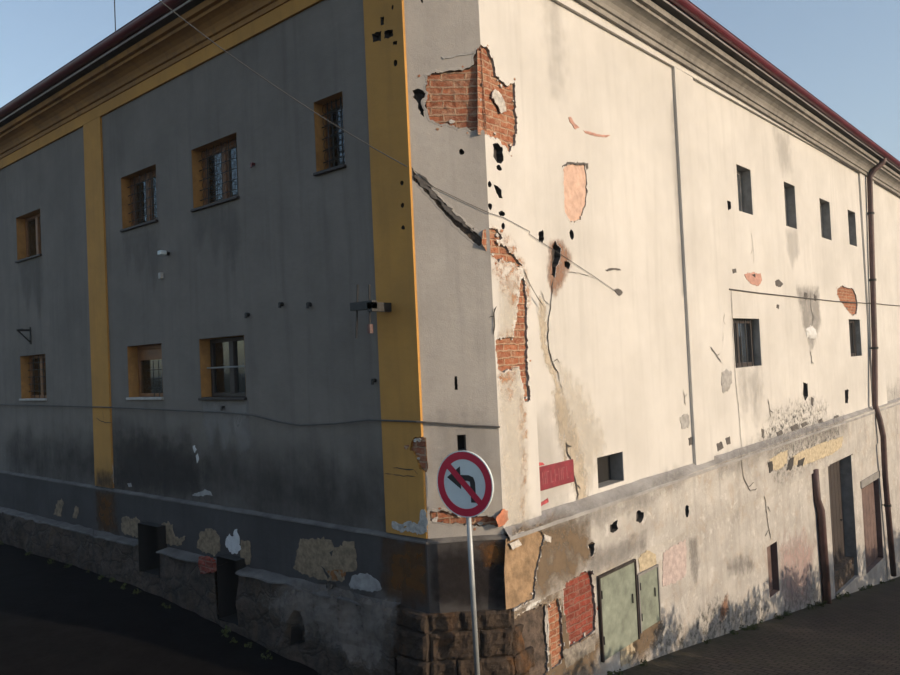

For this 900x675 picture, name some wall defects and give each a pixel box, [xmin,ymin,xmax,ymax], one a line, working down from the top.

flaking render [417,44,519,157]
flaking render [561,161,588,225]
flaking render [414,173,532,404]
flaking render [837,285,858,317]
crack [524,270,593,390]
flaking render [404,435,428,472]
crack [566,443,580,499]
flaking render [121,516,140,538]
flaking render [197,528,251,574]
flaking render [293,537,382,592]
flaking render [392,507,509,535]
flaking render [504,523,598,675]